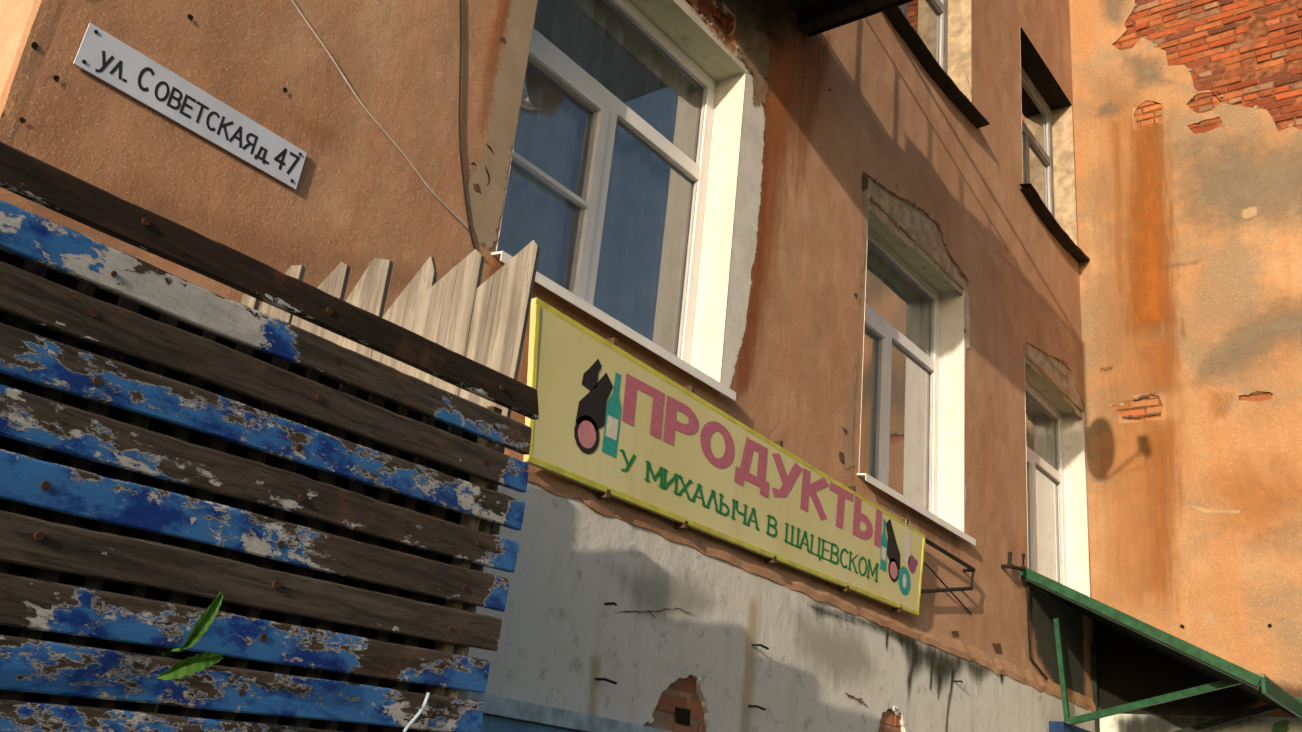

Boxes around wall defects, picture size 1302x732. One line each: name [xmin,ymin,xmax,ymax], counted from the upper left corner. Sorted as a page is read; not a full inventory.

peeling [686,0,771,109]
flaking render [1113,0,1302,134]
peeling [466,0,537,250]
water stain [1192,144,1302,218]
corrosion [1116,108,1173,584]
spalling [1109,395,1163,421]
spalling [643,676,712,732]
spalling [878,706,907,732]
water stain [812,604,1003,732]